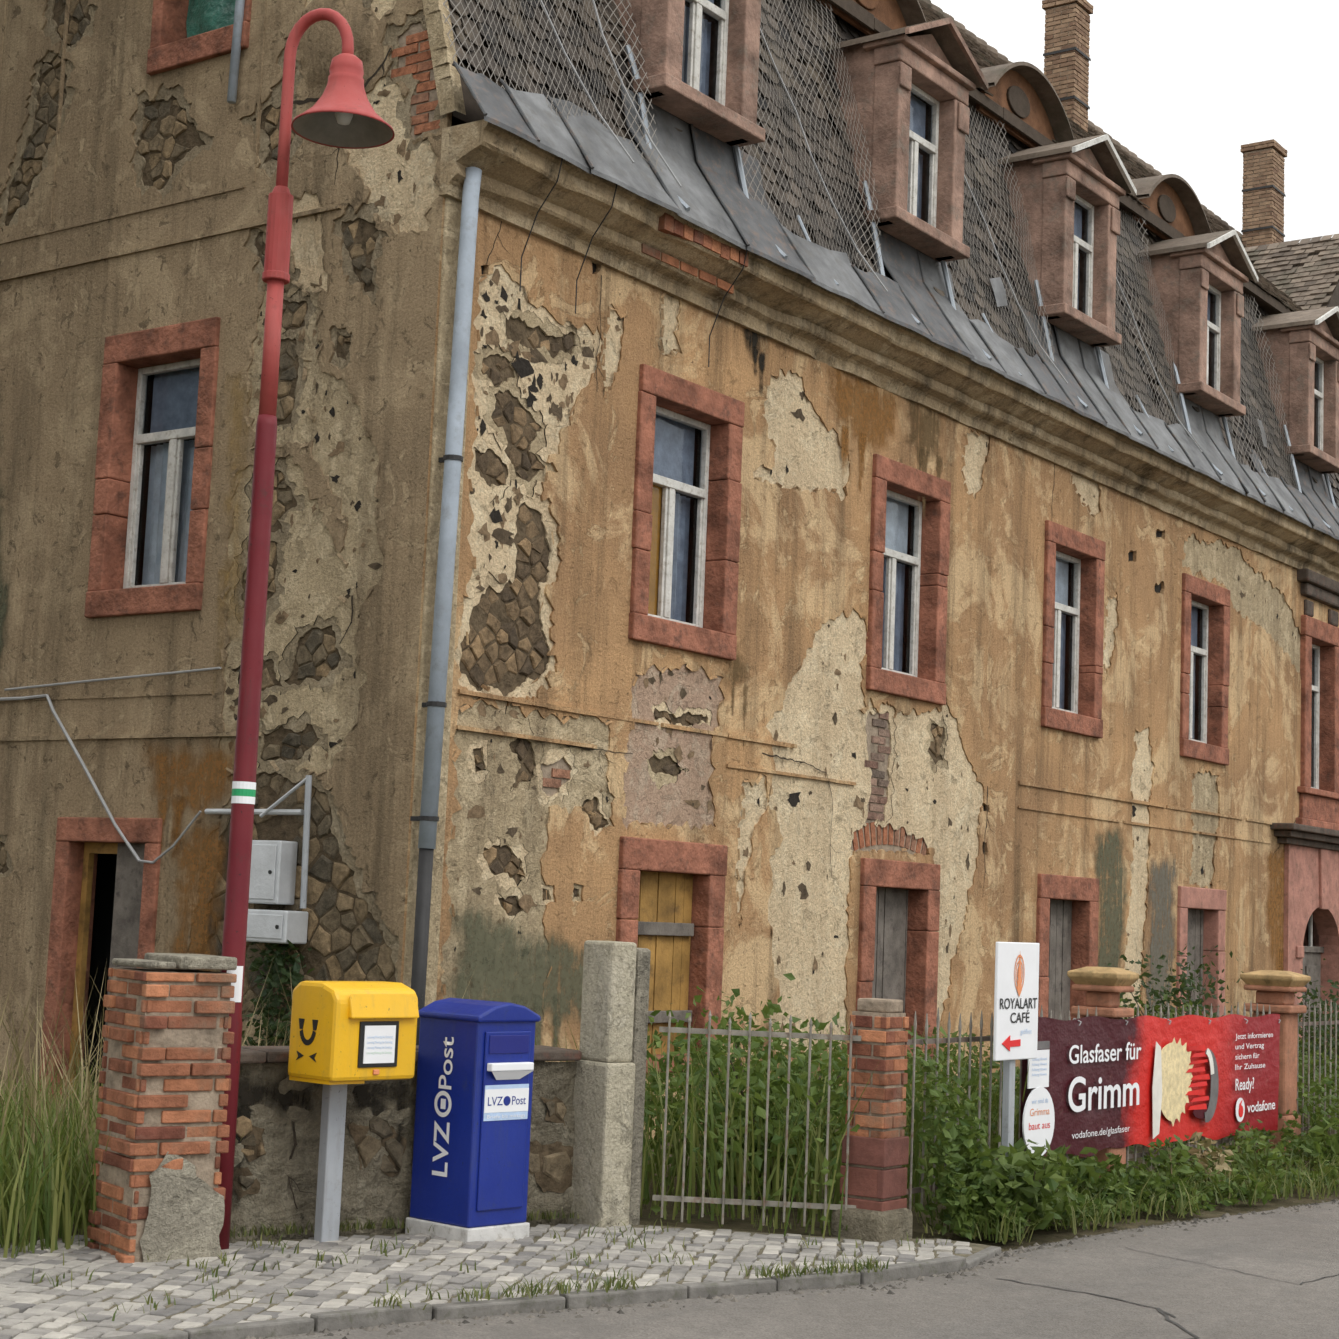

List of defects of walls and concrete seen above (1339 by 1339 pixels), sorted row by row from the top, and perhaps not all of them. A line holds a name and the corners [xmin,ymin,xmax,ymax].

flaking render [0,0,98,228]
flaking render [131,84,214,201]
peeling [189,465,254,972]
flaking render [241,0,448,1024]
peeling [440,264,725,1022]
peeling [753,369,851,501]
peeling [735,610,983,1054]
peeling [1120,728,1154,1019]